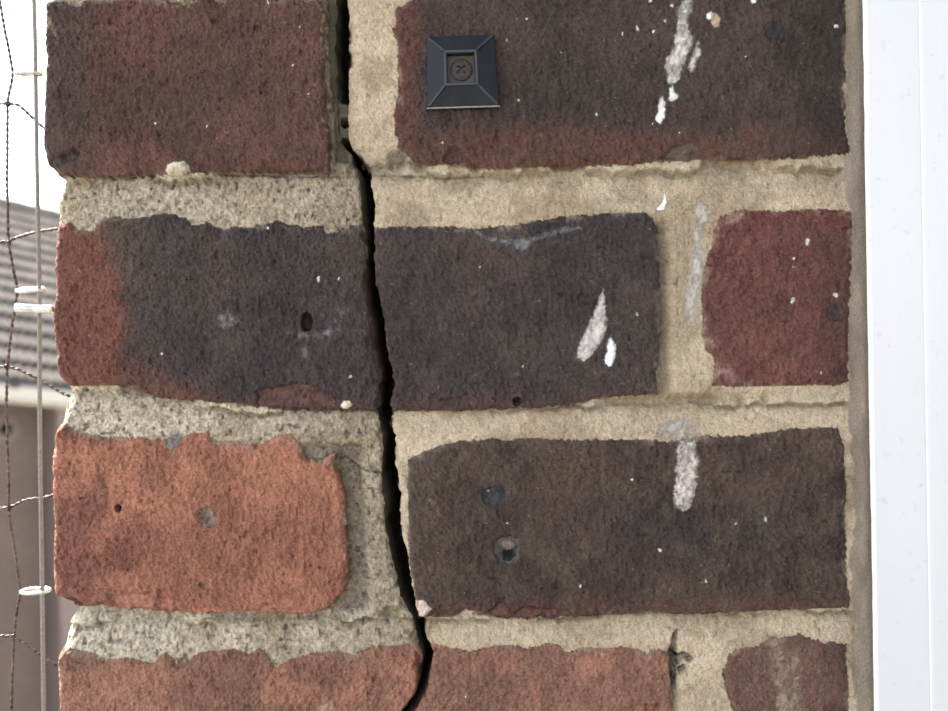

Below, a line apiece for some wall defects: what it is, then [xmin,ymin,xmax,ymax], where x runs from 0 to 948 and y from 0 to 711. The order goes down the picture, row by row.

crack [335,0,434,711]